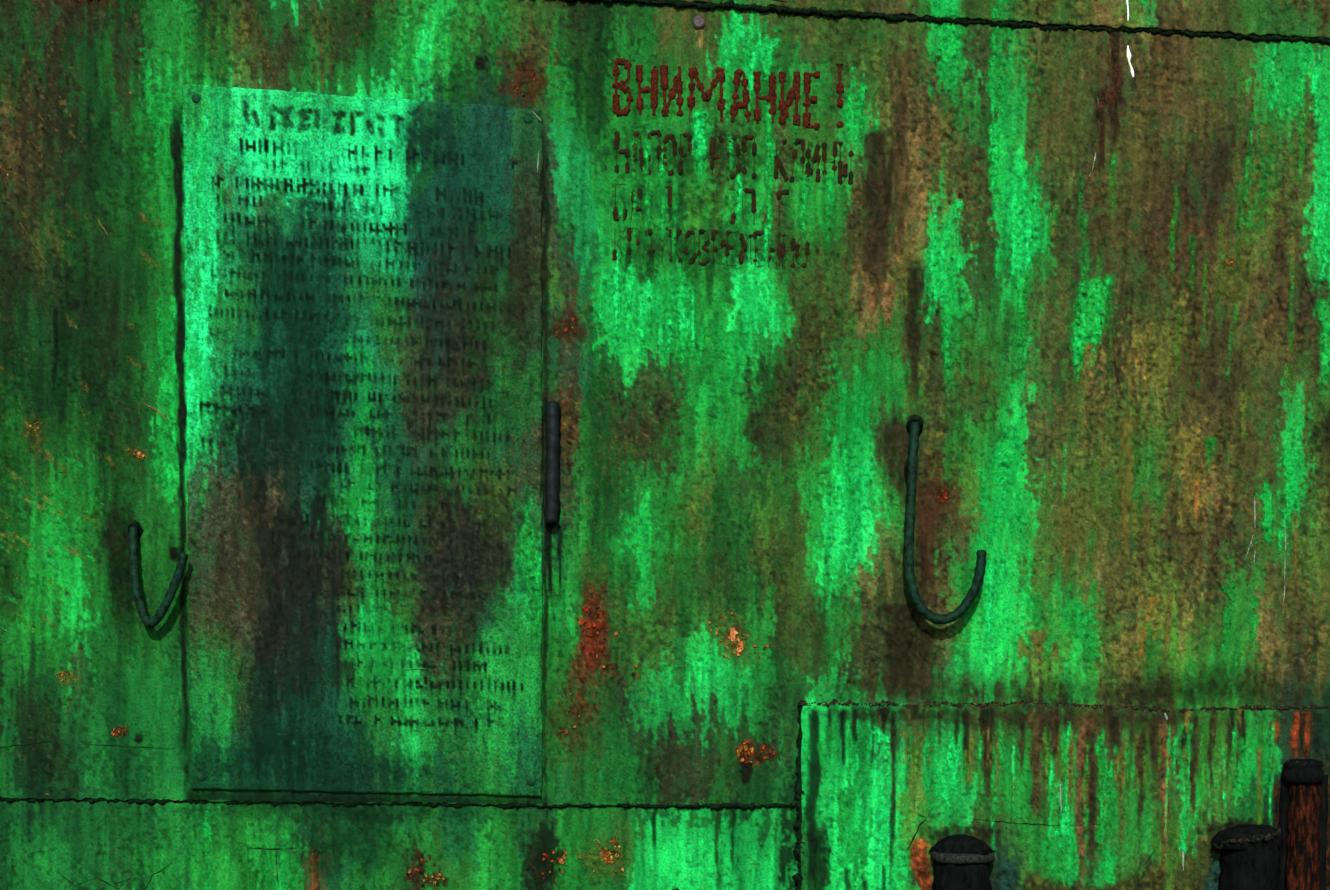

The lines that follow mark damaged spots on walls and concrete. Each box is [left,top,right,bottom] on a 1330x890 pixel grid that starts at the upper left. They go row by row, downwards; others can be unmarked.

rust [579,599,643,677]
rust [708,608,772,658]
rust [736,740,776,766]
rust [406,849,447,890]
rust [525,847,567,888]
rust [585,837,624,872]